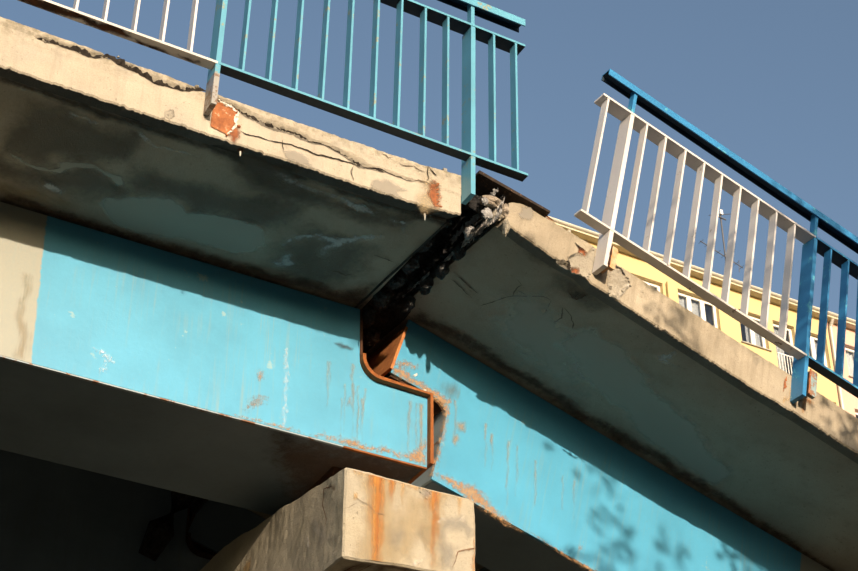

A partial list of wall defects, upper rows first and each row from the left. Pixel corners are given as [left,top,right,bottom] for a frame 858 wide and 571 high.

damp [0,77,444,226]
crack [37,38,436,184]
damp [275,234,373,282]
spalling [556,244,596,279]
spalling [607,265,631,300]
rust [275,433,421,571]
peeling [321,362,511,525]
rust [416,314,832,570]